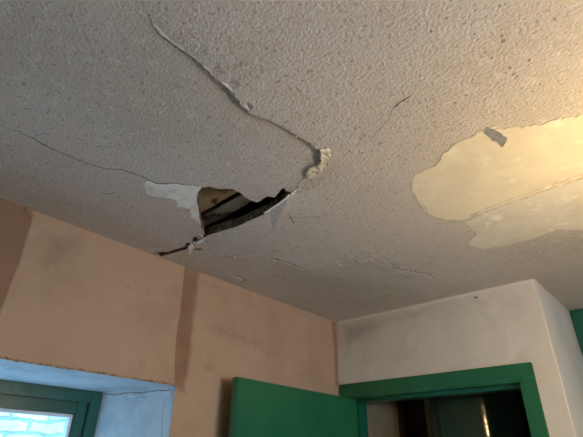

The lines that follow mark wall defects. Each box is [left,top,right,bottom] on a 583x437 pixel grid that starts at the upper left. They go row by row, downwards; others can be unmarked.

crack [144,4,322,156]
crack [2,121,200,187]
flaking render [306,147,331,179]
peeling [409,114,583,249]